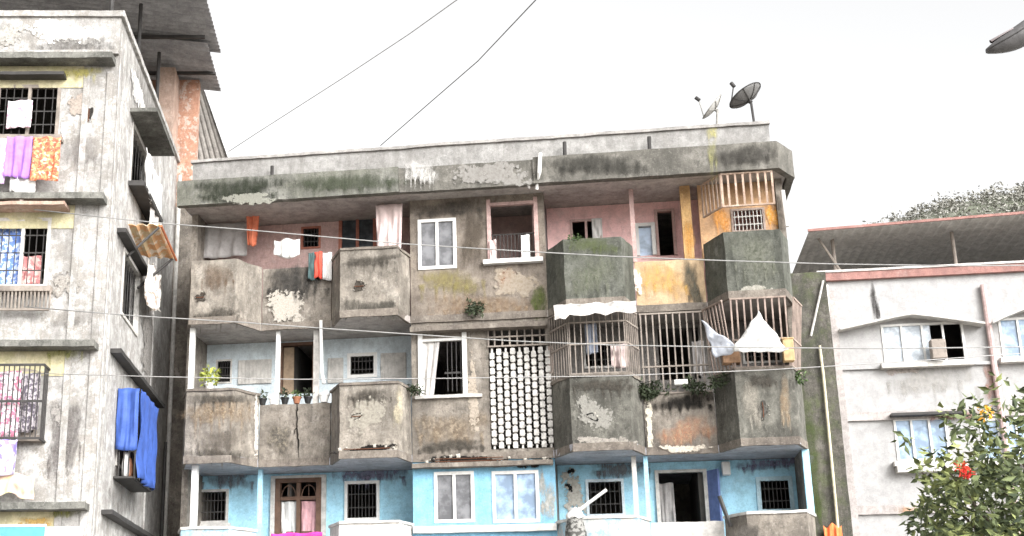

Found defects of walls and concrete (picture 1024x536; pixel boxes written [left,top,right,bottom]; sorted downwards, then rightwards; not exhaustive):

leakage [303,175,405,190]
peeling [405,161,534,188]
leakage [553,155,630,174]
leakage [685,263,703,303]
peeling [266,289,305,323]
leakage [653,394,712,412]
crack [292,404,300,458]
peeling [576,394,712,453]